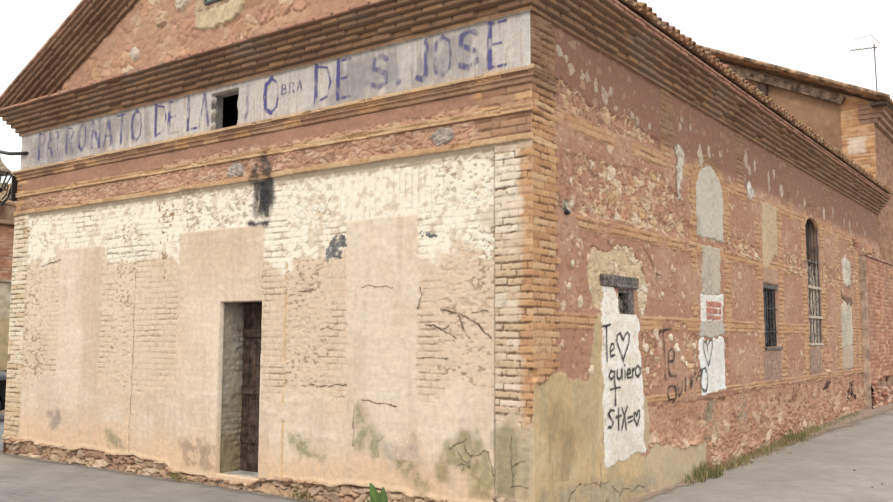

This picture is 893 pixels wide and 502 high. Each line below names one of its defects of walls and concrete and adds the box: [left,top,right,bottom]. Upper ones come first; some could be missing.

spalling [556,147,686,239]
spalling [326,234,347,263]
peeling [463,233,495,267]
spalling [576,243,656,318]
spalling [784,252,807,277]
spalling [640,329,866,471]
crack [568,482,645,502]